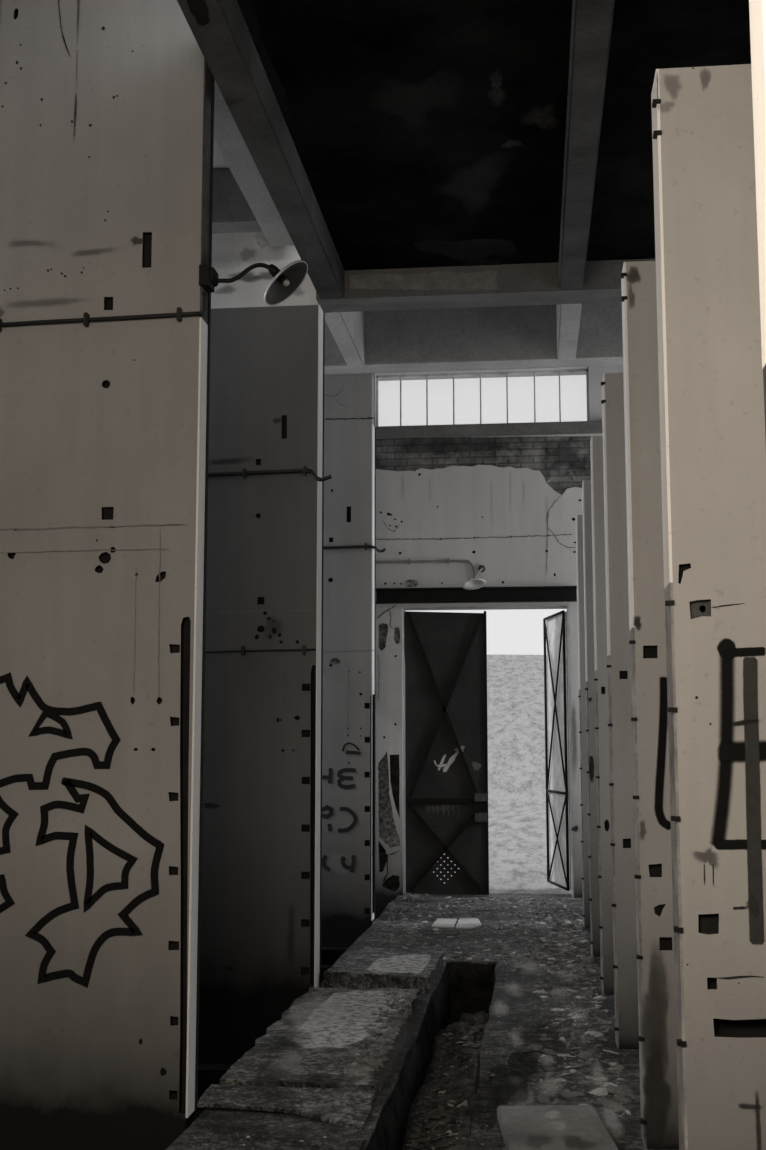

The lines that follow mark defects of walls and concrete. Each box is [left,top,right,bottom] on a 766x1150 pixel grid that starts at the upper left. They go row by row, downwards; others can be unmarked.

flaking render [376,436,591,501]